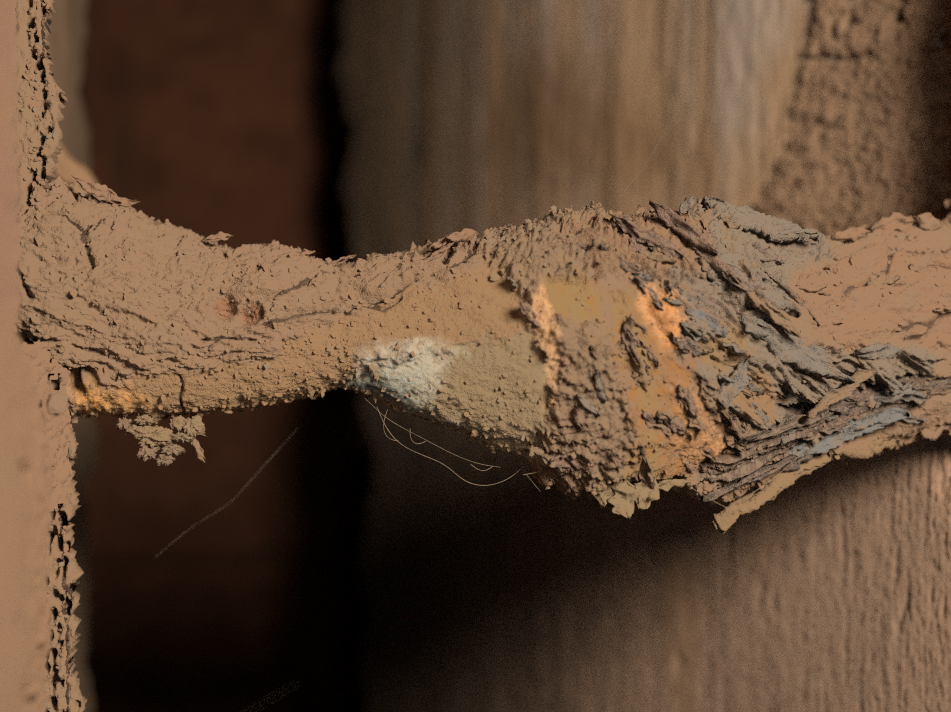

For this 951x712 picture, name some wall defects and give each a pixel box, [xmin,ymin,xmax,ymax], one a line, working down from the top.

crack [59,189,93,269]
crack [18,269,31,298]
crack [264,270,403,326]
crack [200,337,233,349]
peeling [558,196,951,502]
peeling [529,445,580,472]